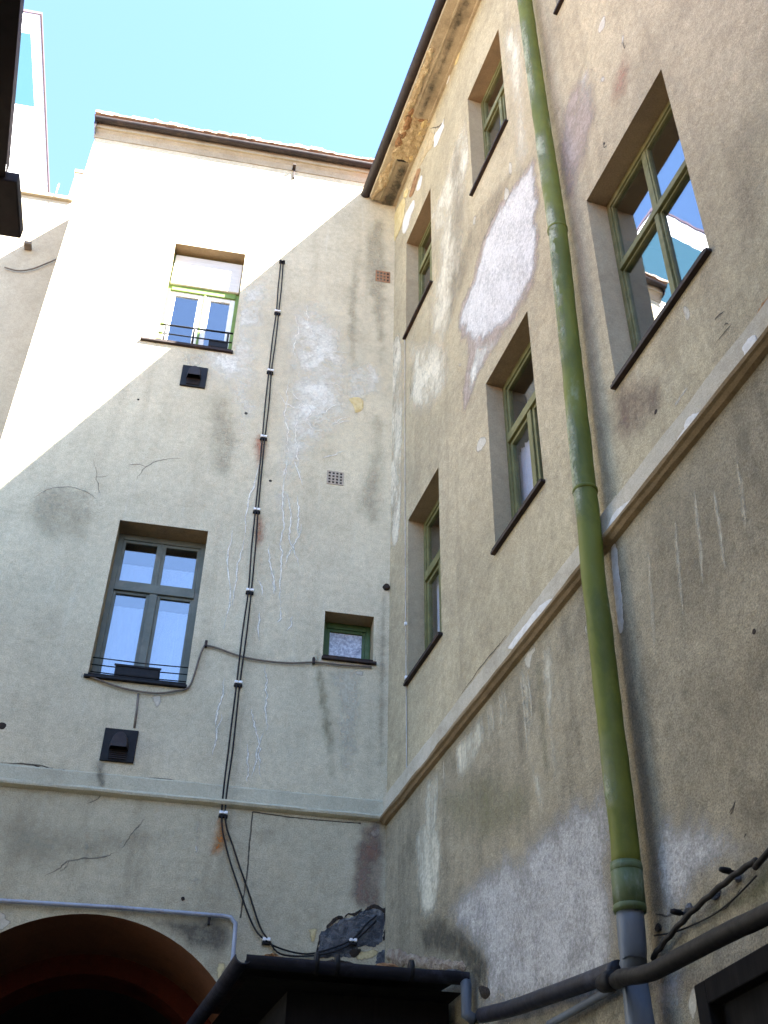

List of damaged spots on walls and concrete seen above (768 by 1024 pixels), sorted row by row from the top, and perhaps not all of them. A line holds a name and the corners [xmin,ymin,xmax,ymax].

peeling [371,48,434,200]
flaking render [394,119,444,241]
flaking render [459,162,539,409]
damp [523,647,551,717]
damp [456,713,492,778]
crack [49,822,142,874]
damp [354,824,381,905]
damp [417,779,611,1002]
spalling [309,904,385,964]